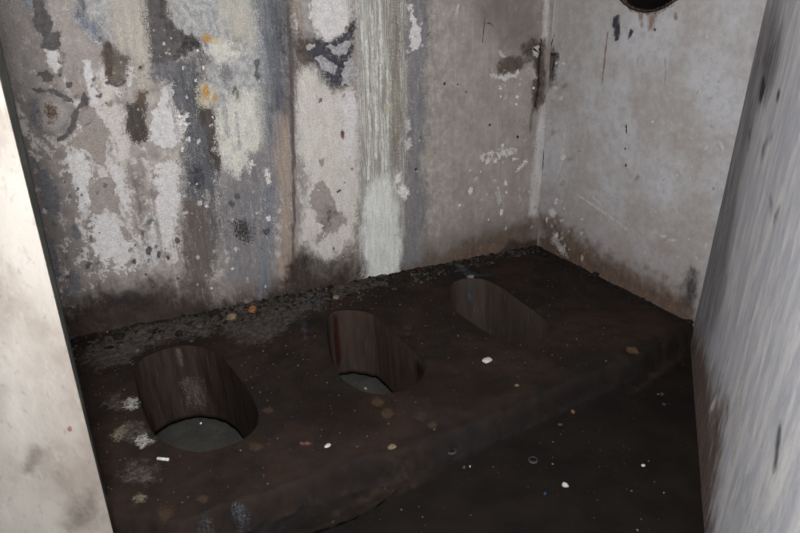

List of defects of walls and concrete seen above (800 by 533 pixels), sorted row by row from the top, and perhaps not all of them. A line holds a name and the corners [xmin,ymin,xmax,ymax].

peeling [23,0,212,301]